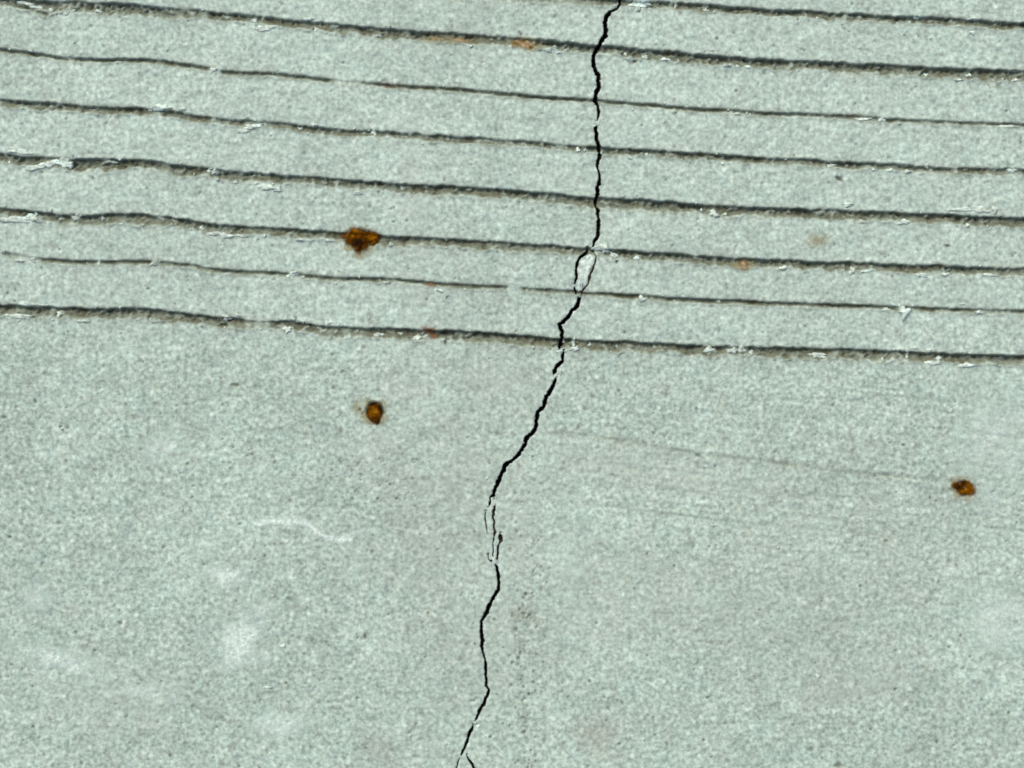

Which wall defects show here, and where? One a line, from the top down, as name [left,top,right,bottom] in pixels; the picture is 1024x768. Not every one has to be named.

corrosion [340,227,380,258]
crack [456,0,622,768]
corrosion [356,399,385,425]
corrosion [951,477,975,501]